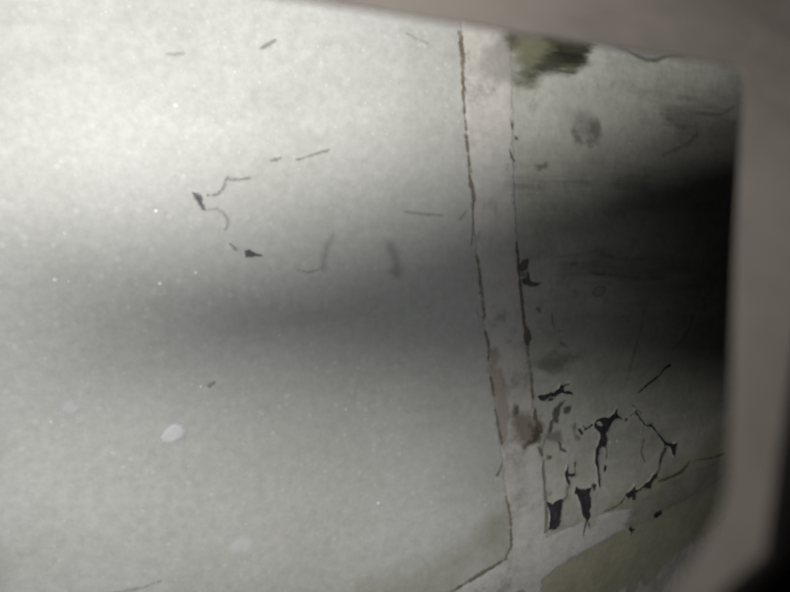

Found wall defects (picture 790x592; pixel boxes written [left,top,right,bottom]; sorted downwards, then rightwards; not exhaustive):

leakage [511,34,590,85]
corrosion [516,242,531,355]
peeling [535,381,575,404]
peeling [544,406,624,535]